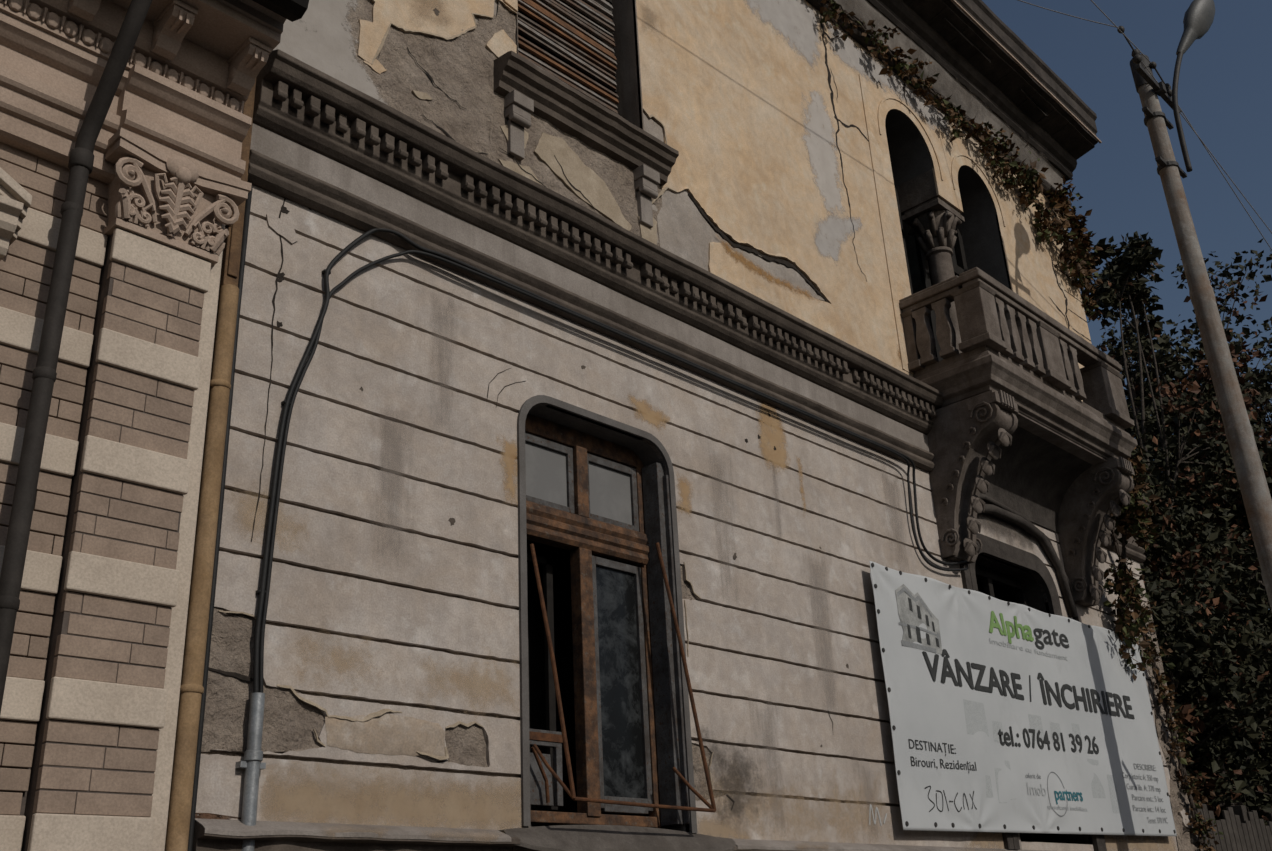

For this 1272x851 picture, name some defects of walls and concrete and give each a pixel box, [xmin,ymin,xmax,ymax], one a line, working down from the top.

spalling [345,0,831,303]
crack [688,192,829,303]
peeling [802,91,862,261]
crack [820,15,869,280]
crack [251,198,312,542]
spalling [201,607,328,752]
spalling [445,721,491,767]